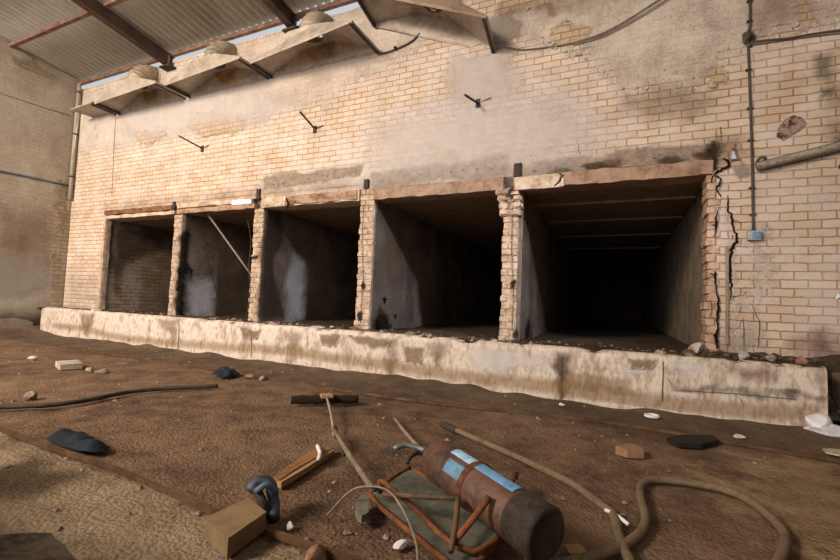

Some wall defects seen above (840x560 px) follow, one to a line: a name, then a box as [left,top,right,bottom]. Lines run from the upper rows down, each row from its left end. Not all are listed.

water stain [373,312,392,330]
crack [703,158,760,349]